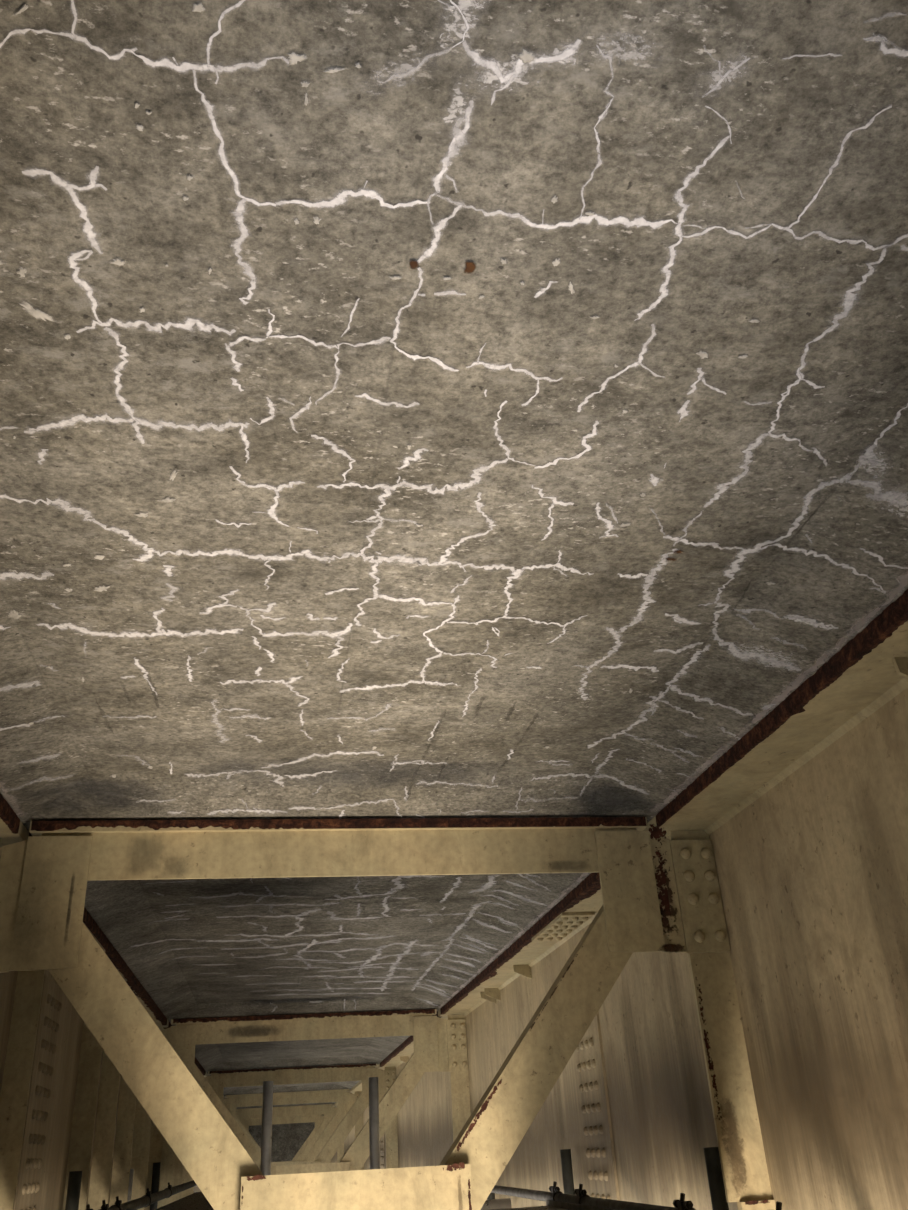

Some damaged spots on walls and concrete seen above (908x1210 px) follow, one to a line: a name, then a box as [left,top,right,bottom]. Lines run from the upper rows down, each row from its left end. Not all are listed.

water stain [440,0,485,48]
water stain [443,43,578,123]
water stain [597,33,656,60]
crack [0,0,908,819]
corrosion [0,589,908,953]
crack [131,874,551,1012]
corrosion [83,872,601,1029]